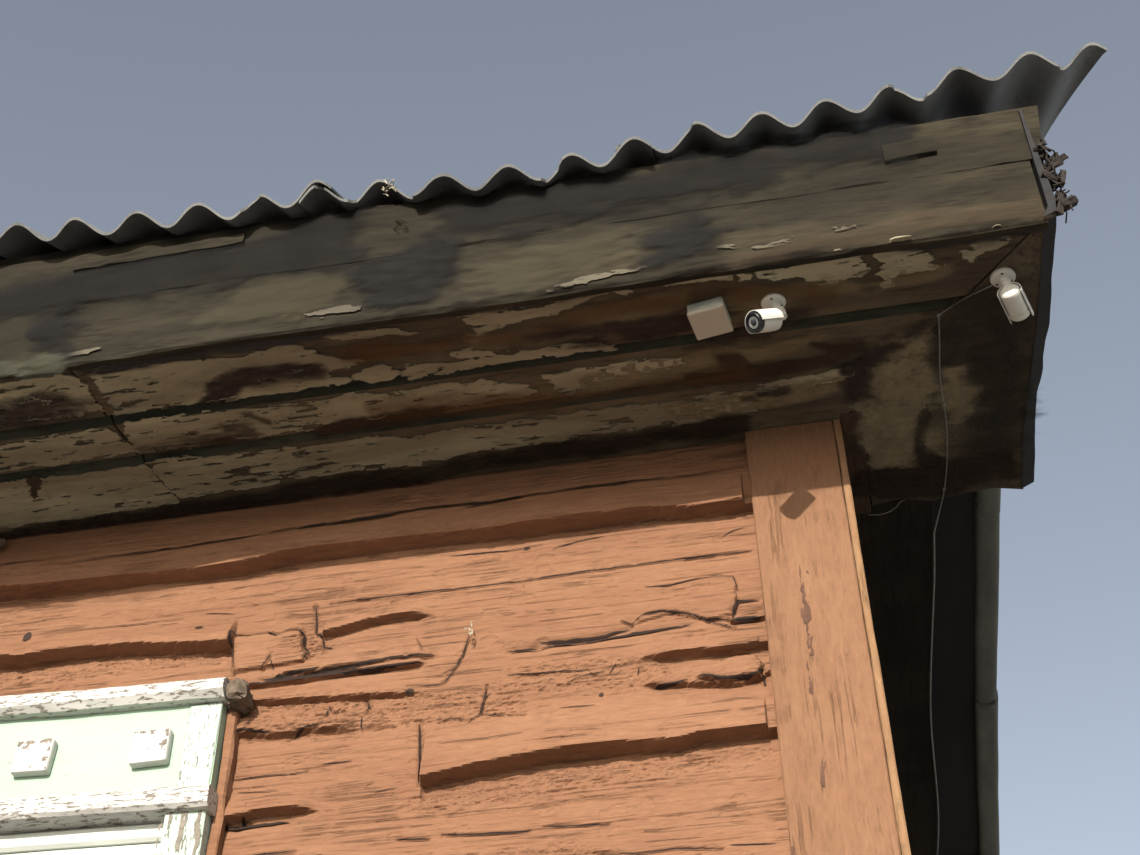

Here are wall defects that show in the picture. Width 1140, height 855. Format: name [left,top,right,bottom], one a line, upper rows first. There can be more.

water stain [0,120,917,375]
peeling [663,236,946,289]
peeling [959,224,1013,263]
peeling [0,266,855,548]
water stain [0,297,1040,540]
crack [4,466,739,564]
crack [40,527,766,792]
peeling [17,738,52,768]
peeling [156,810,202,855]
crack [211,761,348,855]
crack [400,824,606,840]
crack [602,843,770,855]